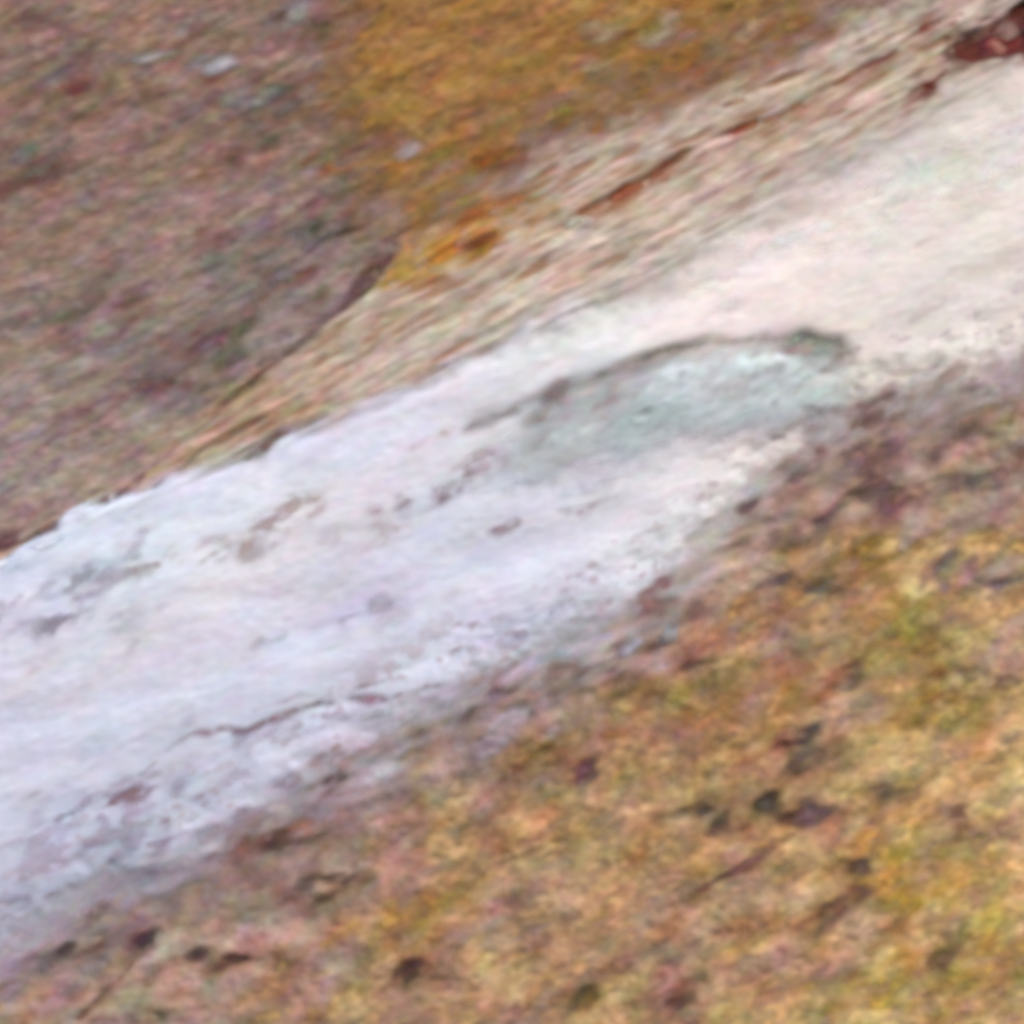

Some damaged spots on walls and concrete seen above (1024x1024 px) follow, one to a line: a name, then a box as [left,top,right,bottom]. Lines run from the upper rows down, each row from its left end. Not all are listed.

leakage [984,117,1024,138]
leakage [867,138,1021,224]
leakage [774,207,842,247]
leakage [864,227,880,238]
leakage [696,277,723,289]
leakage [279,499,300,513]
leakage [31,528,62,550]
leakage [66,574,88,593]
leakage [88,569,130,596]
leakage [474,707,529,759]
leakage [121,797,145,848]
leakage [26,828,61,873]